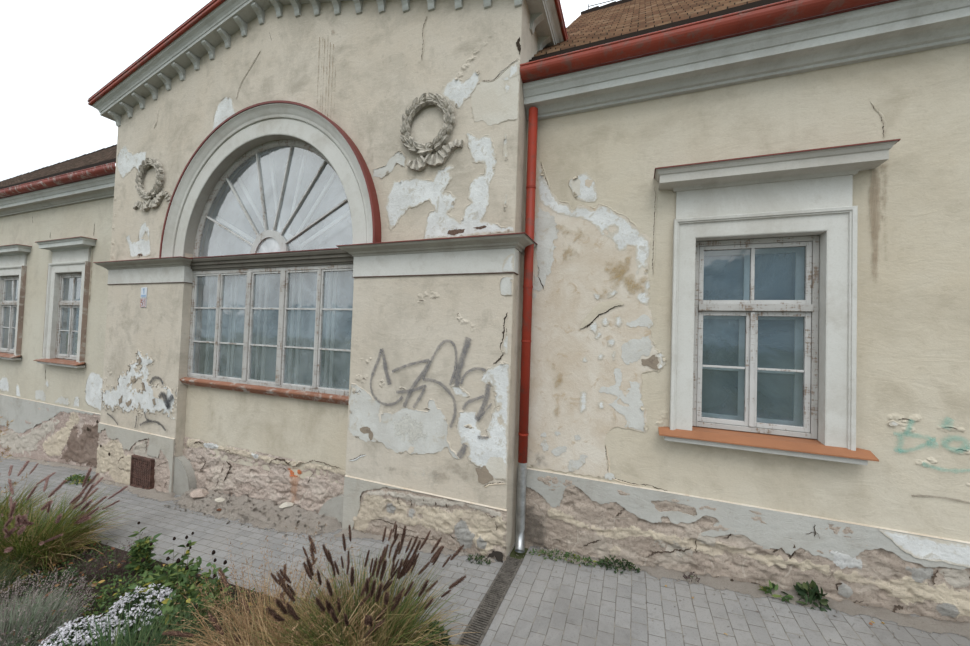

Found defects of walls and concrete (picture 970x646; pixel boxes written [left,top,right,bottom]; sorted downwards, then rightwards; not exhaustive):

peeling [117,145,146,178]
peeling [385,60,520,239]
peeling [126,221,151,258]
peeling [499,254,516,296]
spalling [0,350,178,493]
peeling [348,336,511,484]
peeling [524,158,970,623]
spalling [353,487,507,563]